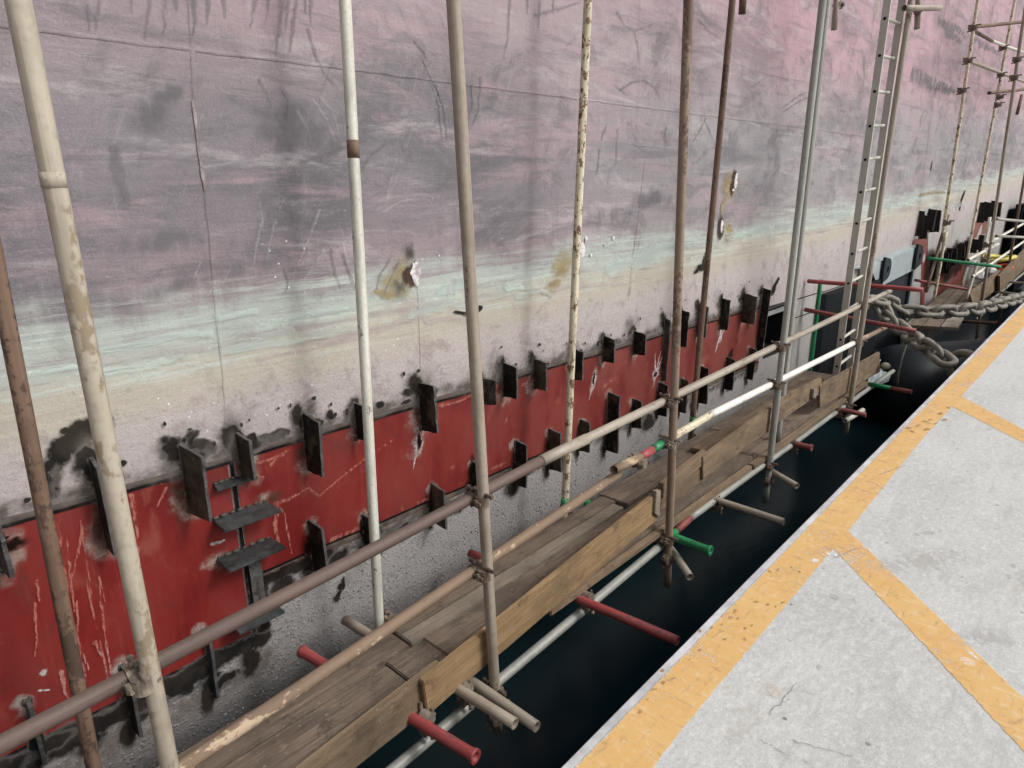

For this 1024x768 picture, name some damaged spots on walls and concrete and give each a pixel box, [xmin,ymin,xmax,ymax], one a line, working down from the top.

corrosion [718,170,738,241]
corrosion [375,247,421,300]